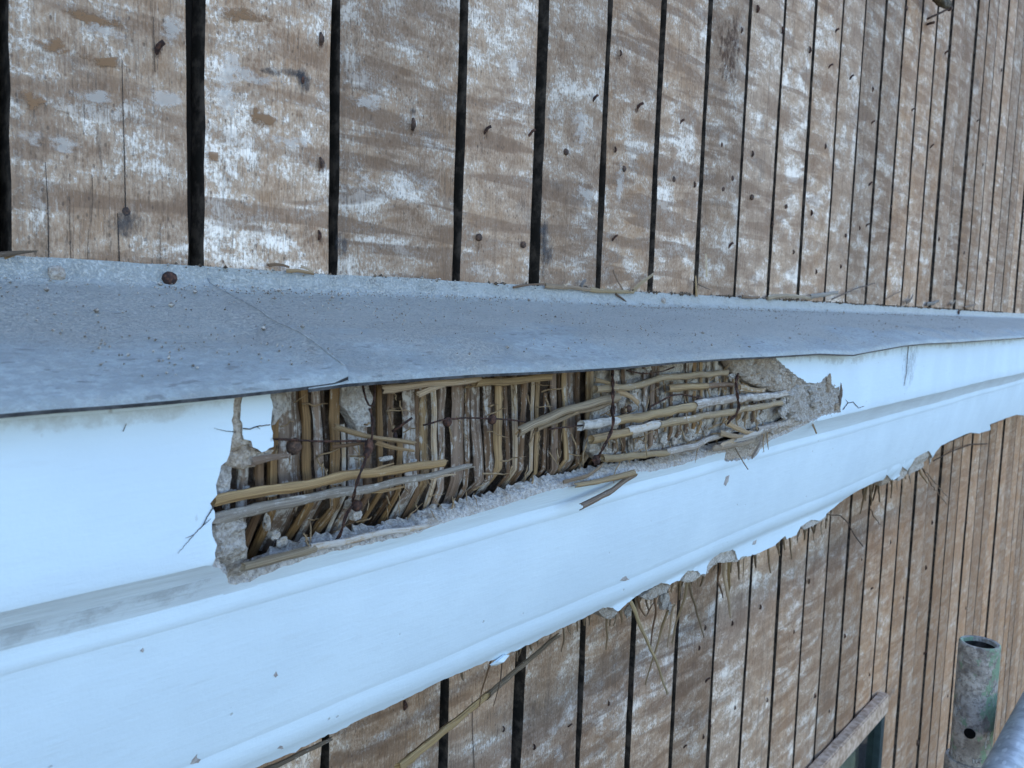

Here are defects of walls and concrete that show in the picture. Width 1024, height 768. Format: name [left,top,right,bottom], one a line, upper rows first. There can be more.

flaking render [339,385,373,431]
flaking render [583,358,843,467]
flaking render [216,392,287,494]
spalling [873,452,931,486]
flaking render [212,520,249,577]
flaking render [262,513,288,549]
flaking render [343,498,362,521]
spalling [593,551,745,619]